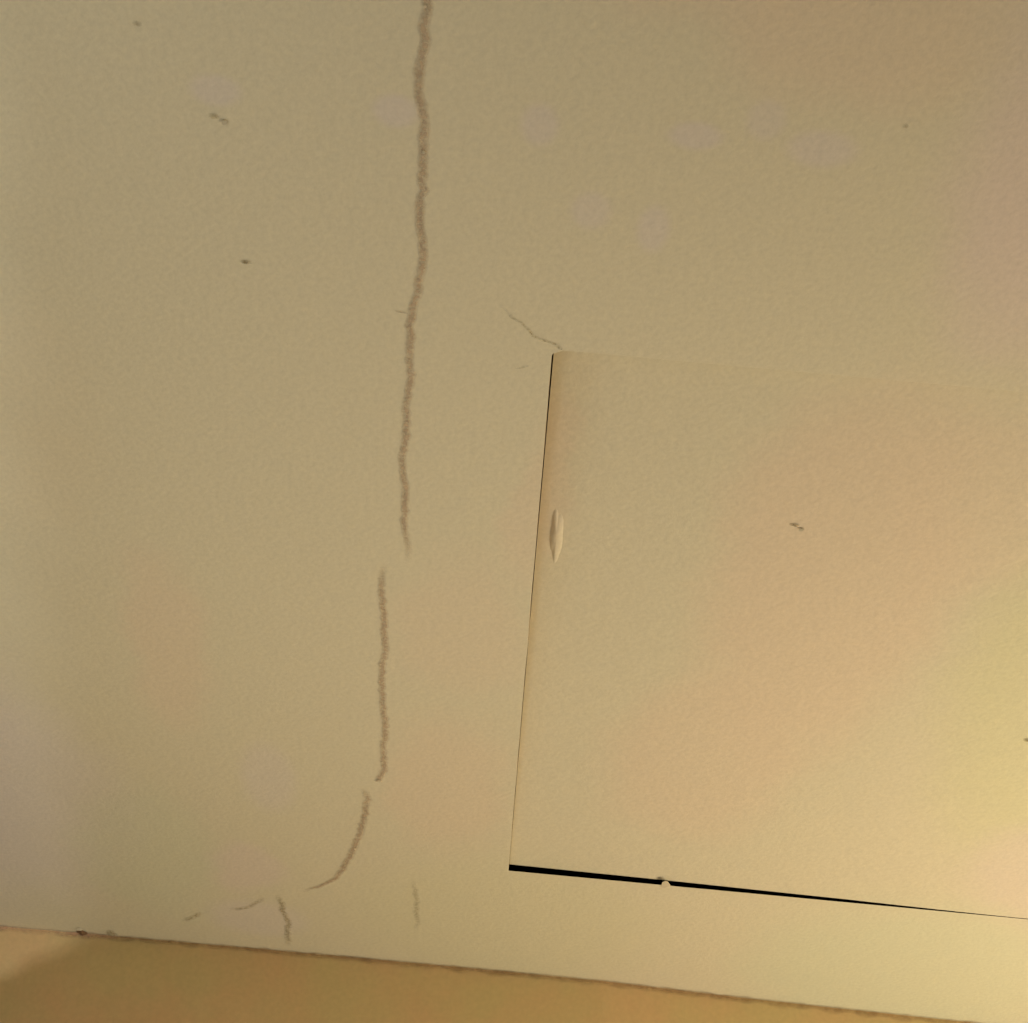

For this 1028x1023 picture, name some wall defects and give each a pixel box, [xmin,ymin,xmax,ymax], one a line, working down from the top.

crack [400,0,430,530]
crack [314,583,388,888]
crack [221,903,391,962]
crack [443,966,538,976]